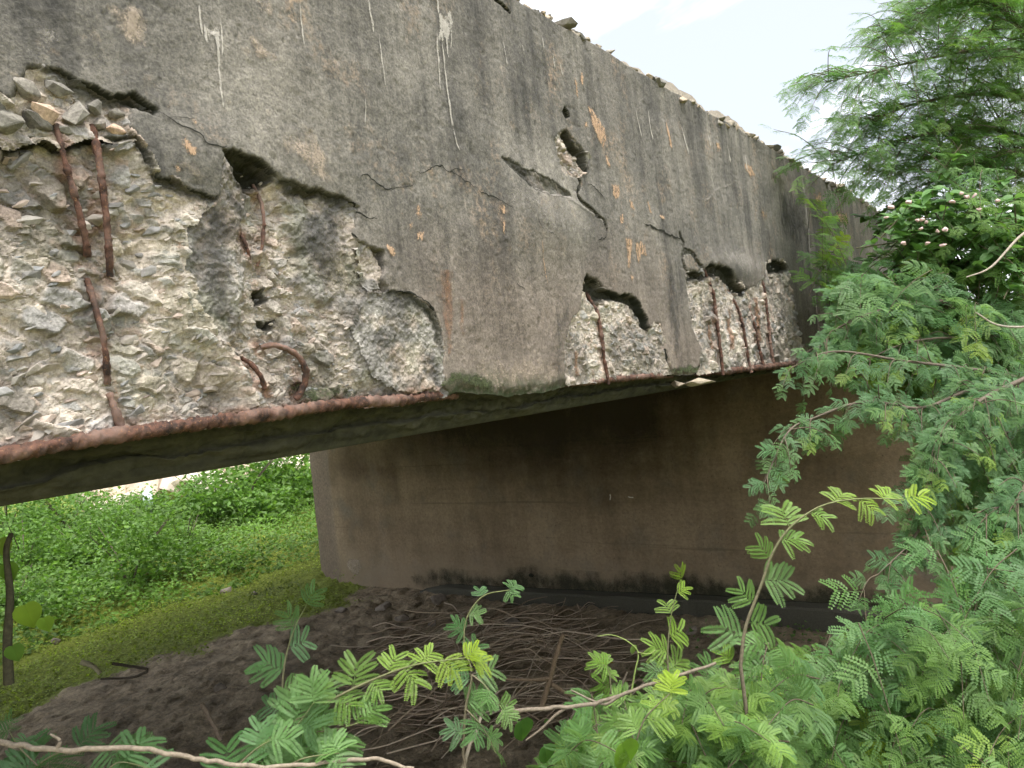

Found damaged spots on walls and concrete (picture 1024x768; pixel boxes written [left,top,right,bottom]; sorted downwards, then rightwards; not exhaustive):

damp [436,0,460,150]
corrosion [89,124,114,277]
crack [163,113,229,148]
spalling [0,63,449,447]
crack [360,164,514,208]
spalling [555,129,591,178]
crack [644,223,705,278]
corrosion [0,278,459,464]
corrosion [565,291,675,387]
spalling [551,258,809,388]
corrosion [693,269,815,377]
damp [416,567,894,608]